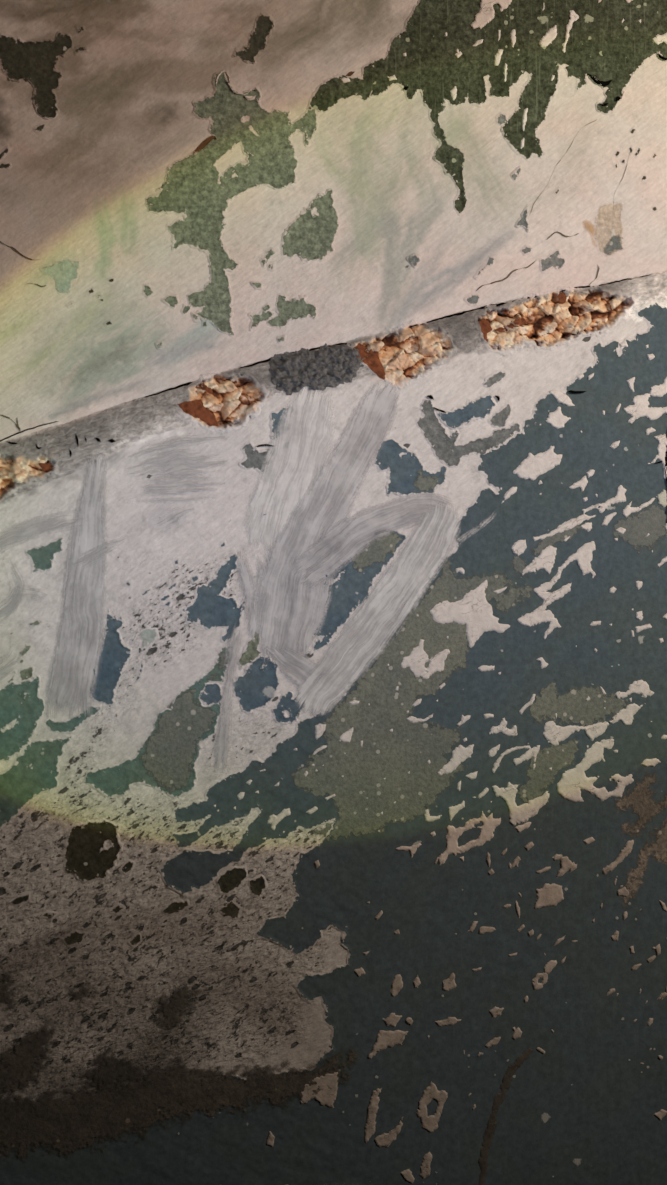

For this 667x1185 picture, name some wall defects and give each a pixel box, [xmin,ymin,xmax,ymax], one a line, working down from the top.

peeling [0,145,12,171]
peeling [142,0,667,474]
peeling [0,253,667,1185]